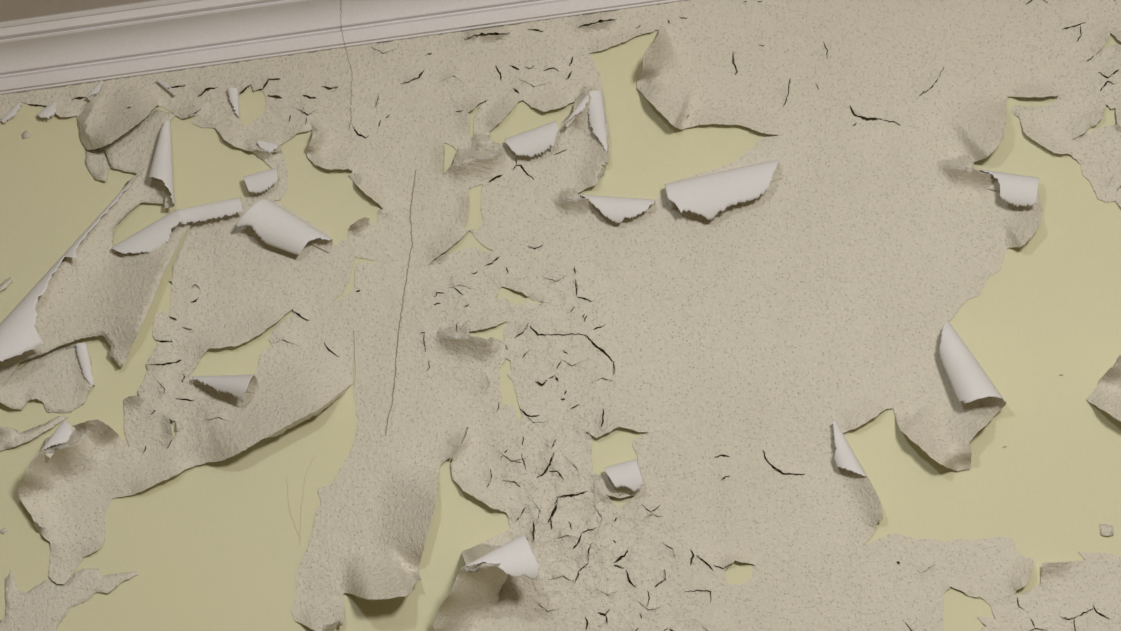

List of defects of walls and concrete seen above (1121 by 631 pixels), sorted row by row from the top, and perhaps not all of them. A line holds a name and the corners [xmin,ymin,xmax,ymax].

crack [1064,22,1119,91]
peeling [0,27,647,631]
crack [385,170,430,435]
crack [434,256,508,330]
crack [506,268,615,433]
peeling [430,0,1121,631]
crack [487,403,755,631]